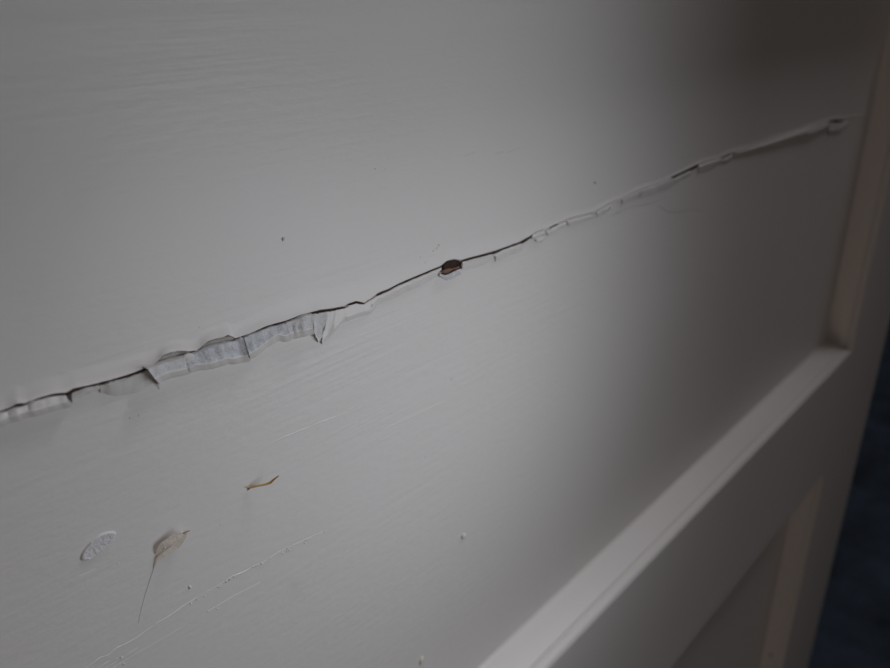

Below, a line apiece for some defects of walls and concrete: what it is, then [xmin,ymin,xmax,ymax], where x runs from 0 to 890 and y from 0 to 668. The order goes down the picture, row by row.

crack [0,111,871,427]